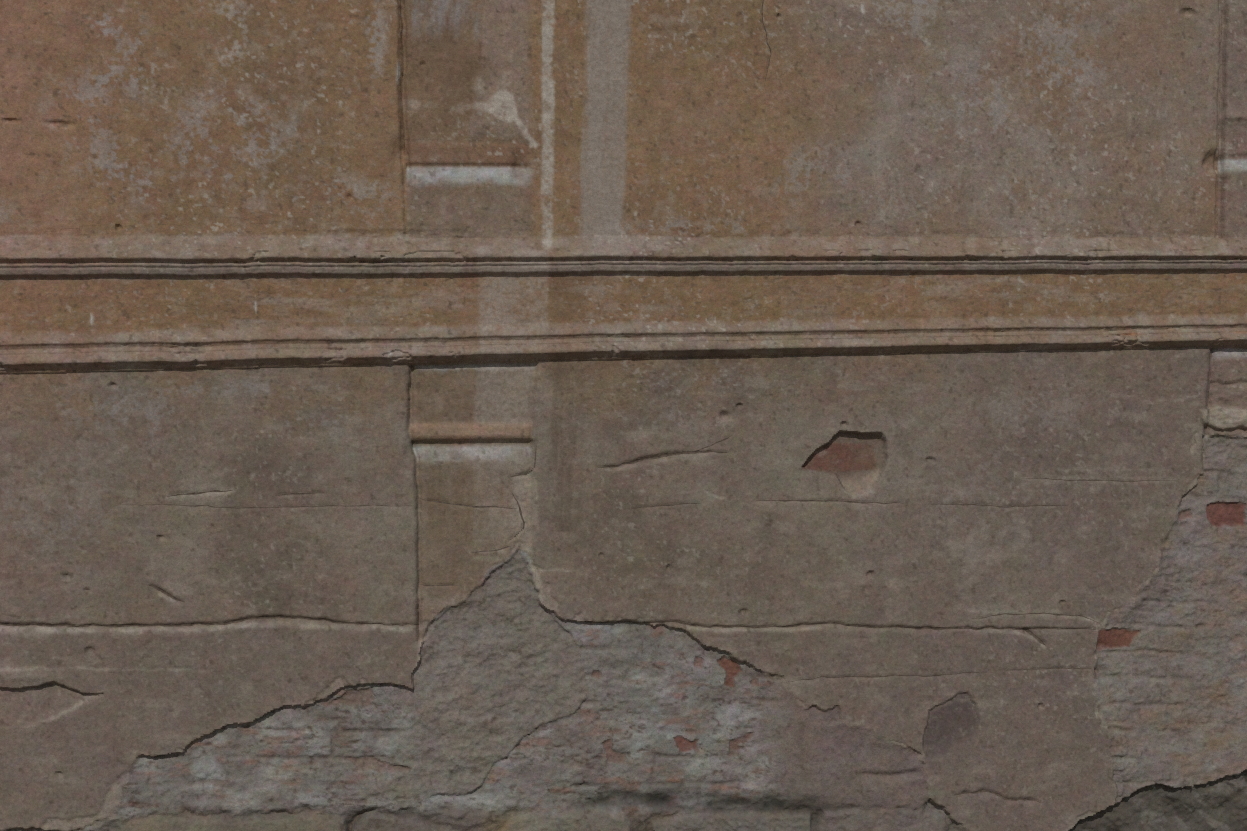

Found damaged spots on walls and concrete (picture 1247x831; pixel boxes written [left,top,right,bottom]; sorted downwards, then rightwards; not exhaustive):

crack [597,436,730,468]
spalling [801,430,864,495]
crack [0,585,417,627]
crack [587,613,1096,682]
spalling [0,681,106,731]
spalling [111,557,982,819]
spalling [1068,770,1247,831]